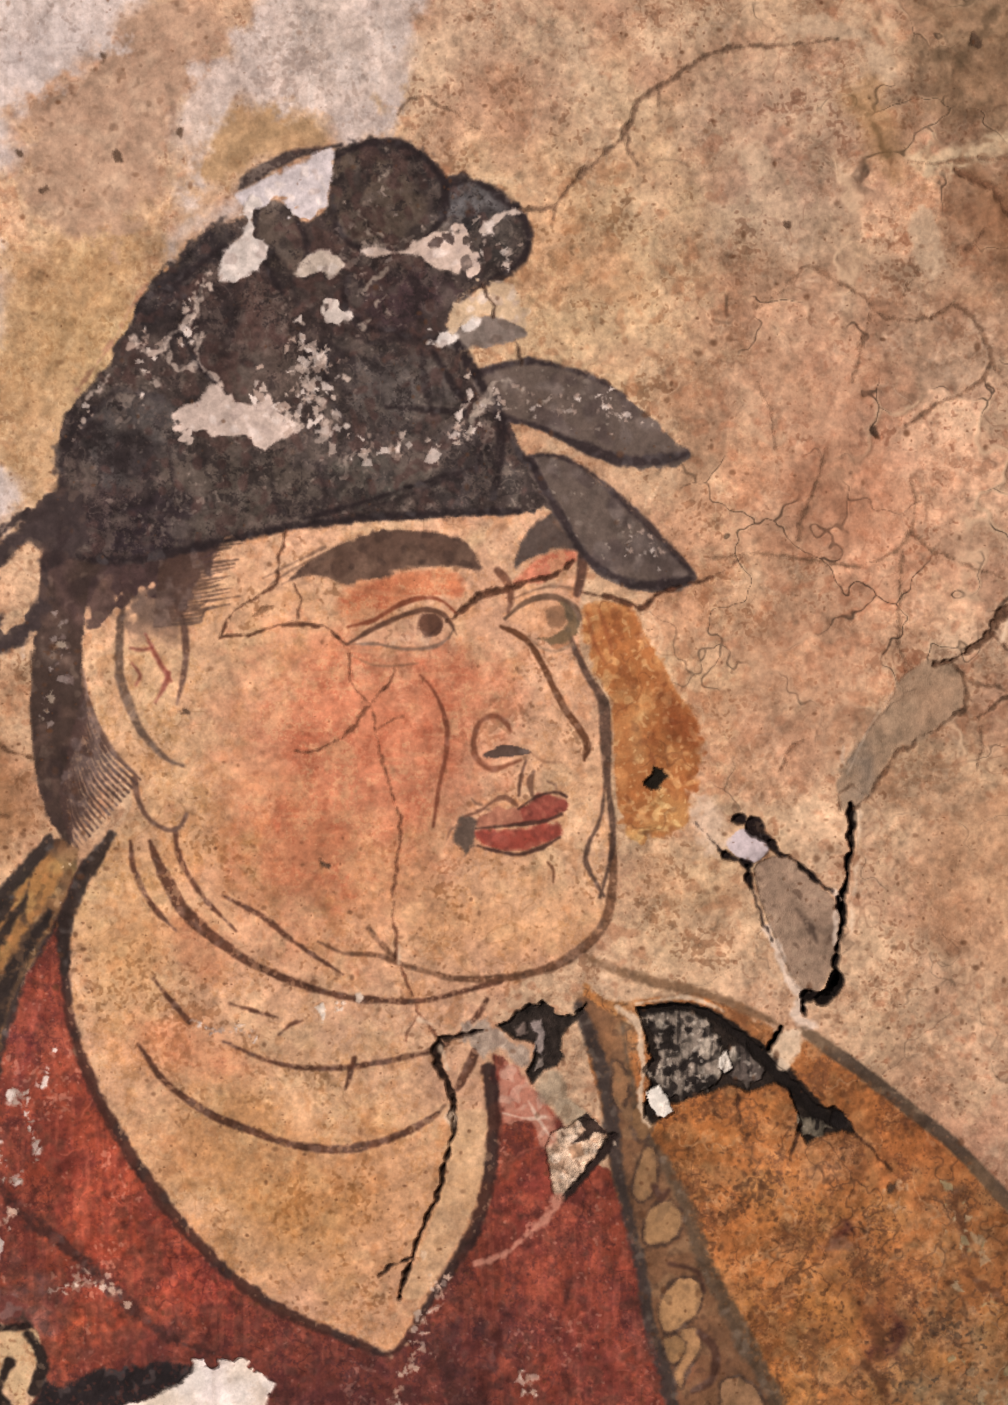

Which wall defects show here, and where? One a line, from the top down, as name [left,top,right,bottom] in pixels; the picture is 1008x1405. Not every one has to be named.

peeling [51,0,646,469]
crack [481,281,525,368]
crack [517,35,840,221]
crack [752,264,1008,429]
crack [907,154,1008,253]
crack [217,527,485,1302]
crack [444,447,1008,1054]
spalling [683,784,770,863]
peeling [0,1046,59,1188]
peeling [384,999,620,1405]
spalling [613,922,856,1147]
flaking render [120,1352,281,1405]